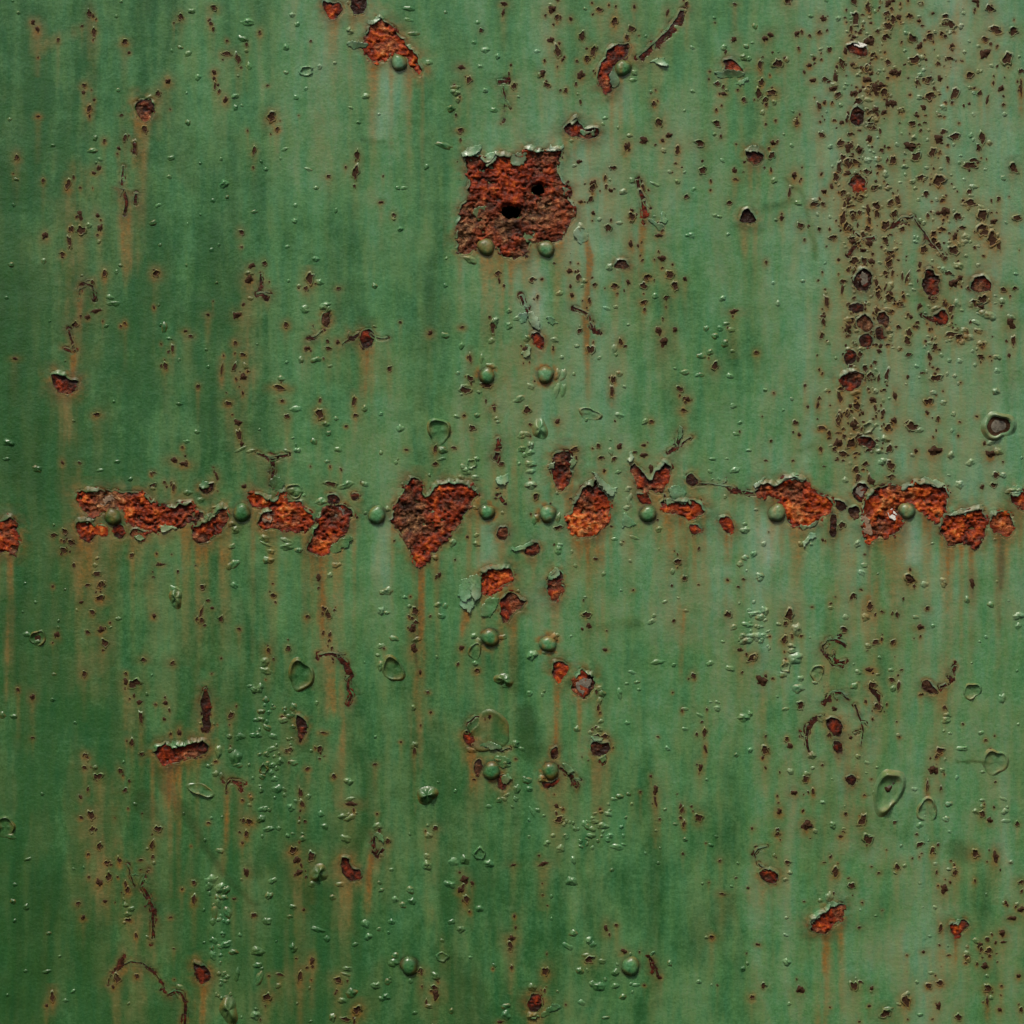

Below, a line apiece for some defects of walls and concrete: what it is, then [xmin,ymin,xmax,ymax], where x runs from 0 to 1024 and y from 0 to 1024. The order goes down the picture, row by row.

rust [211,39,249,104]
rust [347,14,424,107]
rust [0,513,35,712]
rust [27,7,232,1024]
rust [242,481,362,664]
rust [304,338,340,360]
rust [388,0,758,838]
rust [731,0,1024,1024]